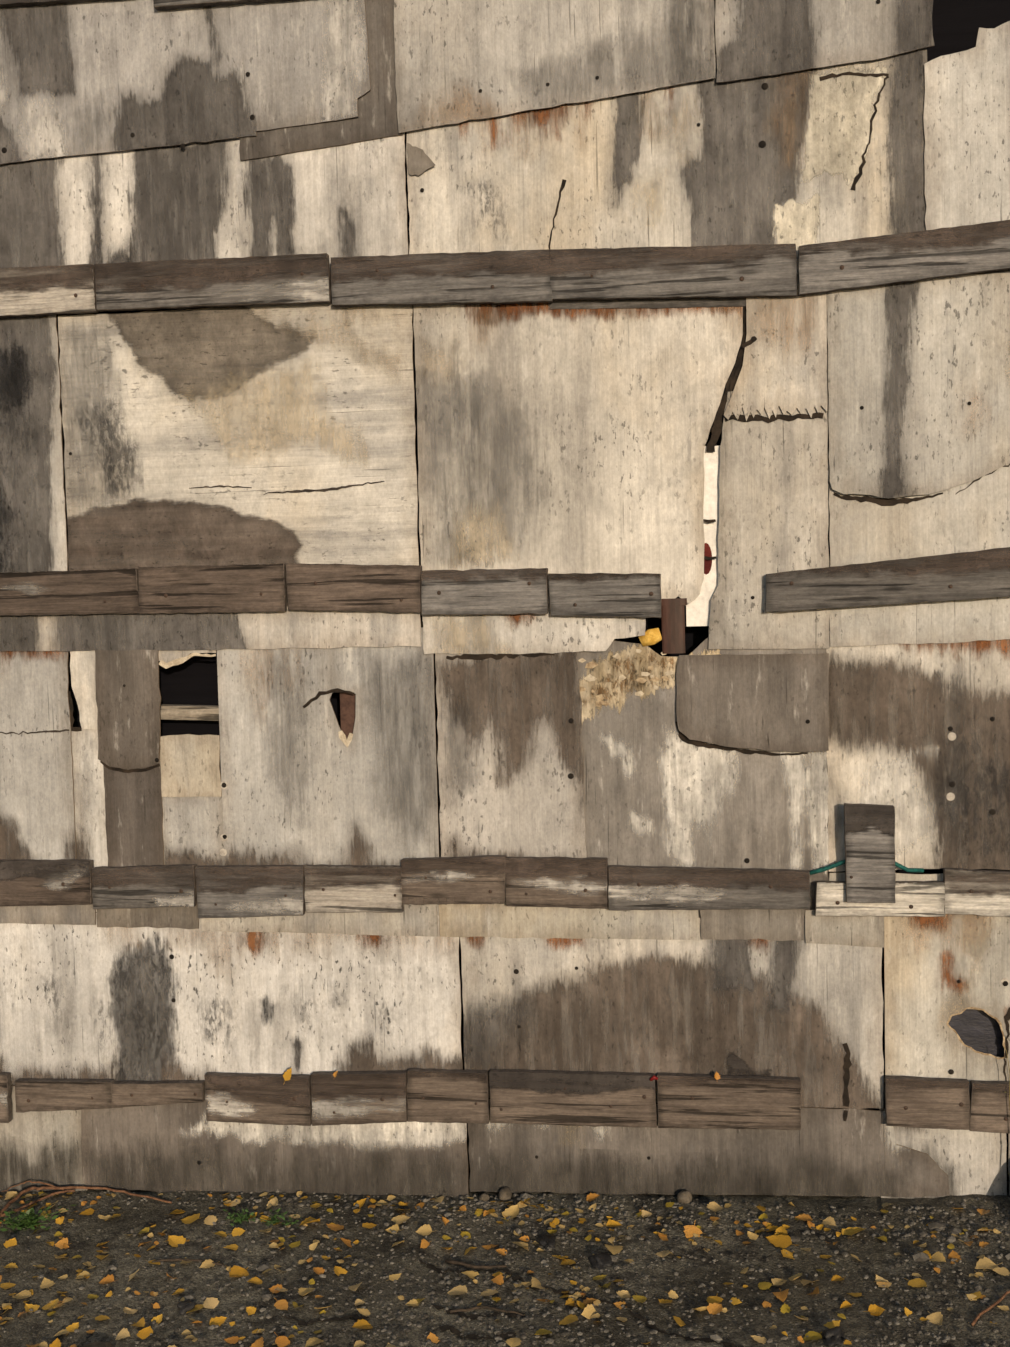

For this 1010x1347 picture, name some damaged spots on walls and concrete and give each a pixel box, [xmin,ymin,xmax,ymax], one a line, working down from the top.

leakage [0,0,1010,292]
crack [819,72,889,190]
leakage [107,306,315,401]
crack [706,307,757,452]
leakage [0,315,302,573]
crack [189,481,384,495]
spalling [159,653,216,669]
spalling [578,643,720,722]
rust [906,639,1010,655]
rust [942,952,965,993]
leakage [0,936,1009,1109]
spalling [946,1007,1006,1059]